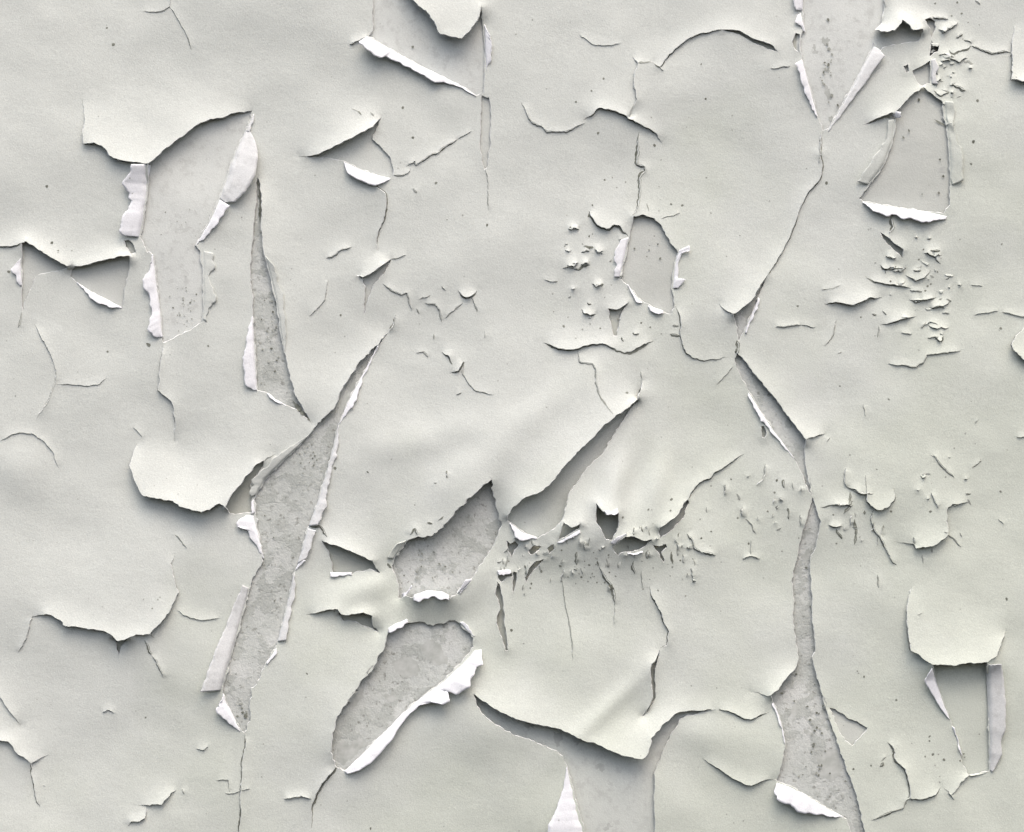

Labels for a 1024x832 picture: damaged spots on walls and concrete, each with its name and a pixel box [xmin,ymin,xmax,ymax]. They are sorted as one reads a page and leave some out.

peeling [784,0,1024,368]
peeling [0,74,896,832]
peeling [894,447,977,555]
peeling [887,574,1024,795]